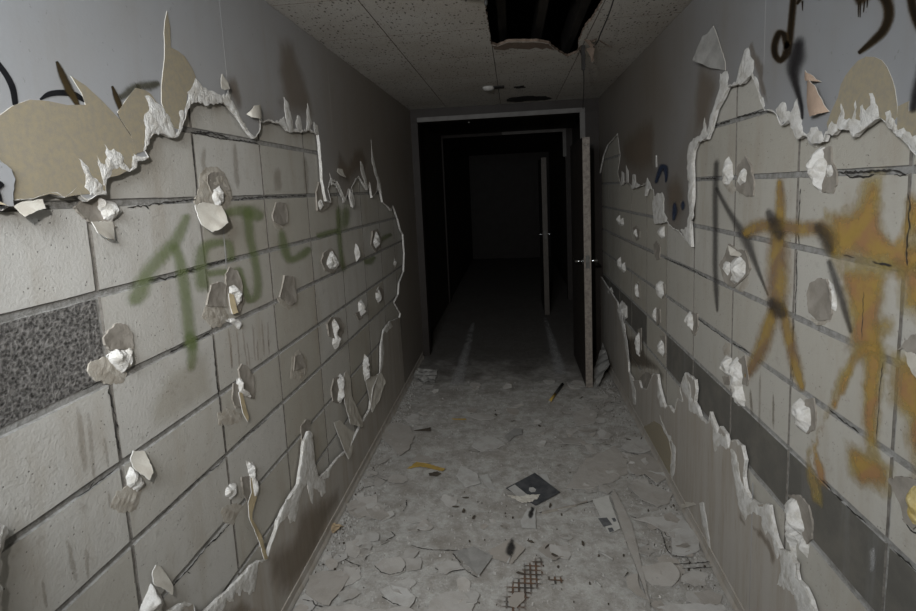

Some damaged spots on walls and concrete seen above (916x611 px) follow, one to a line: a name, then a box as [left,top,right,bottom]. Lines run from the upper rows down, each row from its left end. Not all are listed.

peeling [632,515,700,556]
peeling [657,603,727,611]